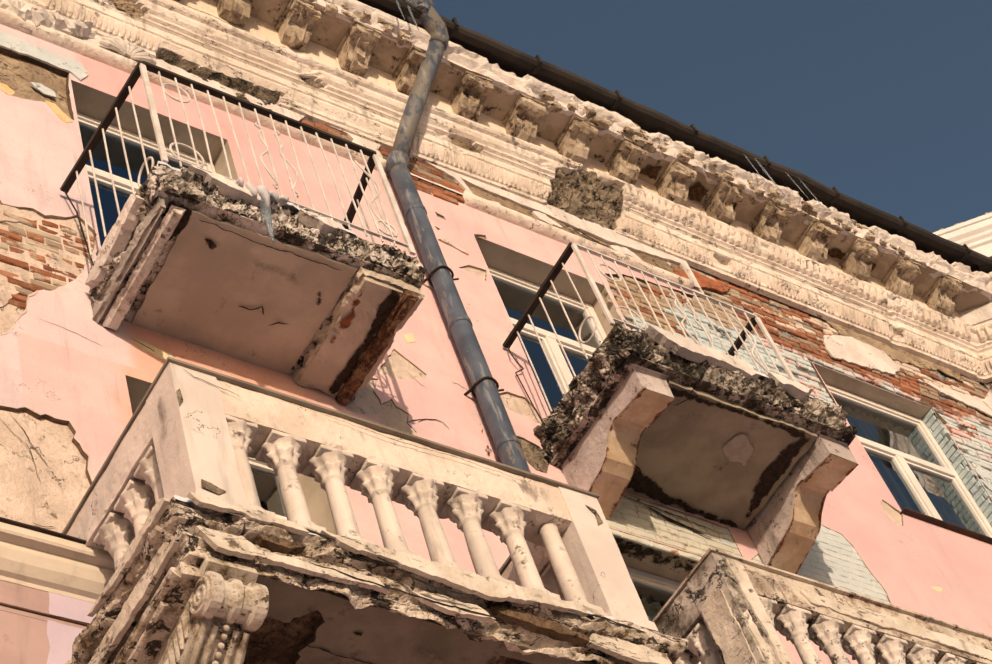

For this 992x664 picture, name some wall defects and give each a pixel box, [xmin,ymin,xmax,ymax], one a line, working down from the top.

flaking render [0,31,88,123]
spalling [541,92,910,260]
flaking render [0,204,97,335]
rust [330,294,362,343]
flaking render [603,266,992,535]
flaking render [0,406,94,533]
flaking render [586,469,763,564]
flaking render [797,525,891,604]
spalling [243,610,322,664]
spalling [488,656,532,664]